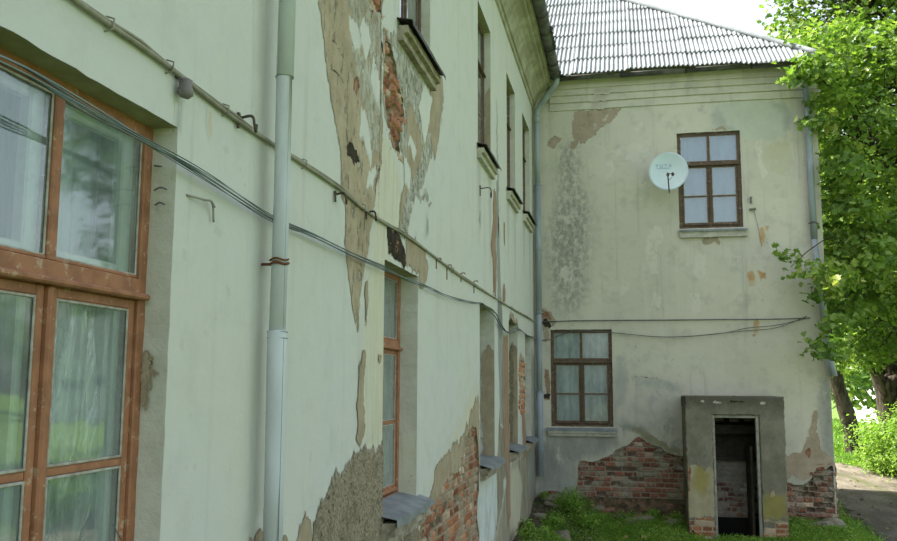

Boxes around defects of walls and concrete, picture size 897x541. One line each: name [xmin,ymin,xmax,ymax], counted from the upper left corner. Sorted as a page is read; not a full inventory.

peeling [318,0,444,332]
peeling [547,108,621,150]
spalling [140,350,159,411]
peeling [283,511,313,541]
flaking render [420,333,526,541]
peeling [491,189,519,328]
damp [476,99,627,541]
flaking render [537,410,839,540]